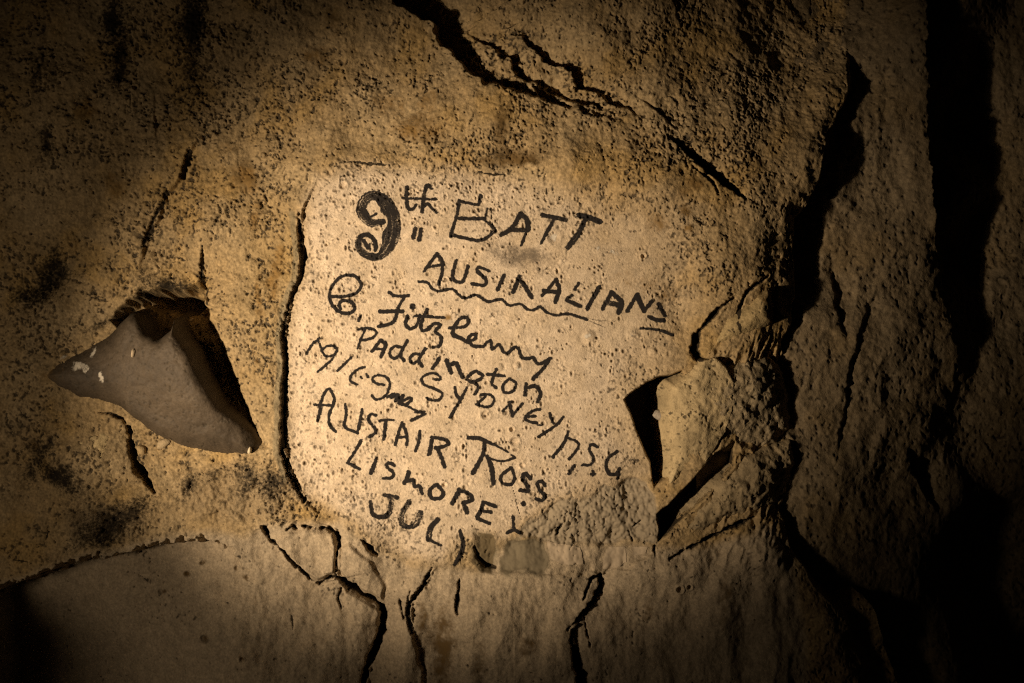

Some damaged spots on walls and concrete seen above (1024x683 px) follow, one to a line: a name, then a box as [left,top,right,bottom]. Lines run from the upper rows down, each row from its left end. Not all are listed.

crack [142,149,193,247]
crack [341,159,387,167]
crack [670,138,746,200]
crack [100,412,156,493]
crack [263,213,433,683]
crack [474,546,496,569]
crack [628,516,753,560]
crack [453,579,461,615]
crack [567,573,602,683]